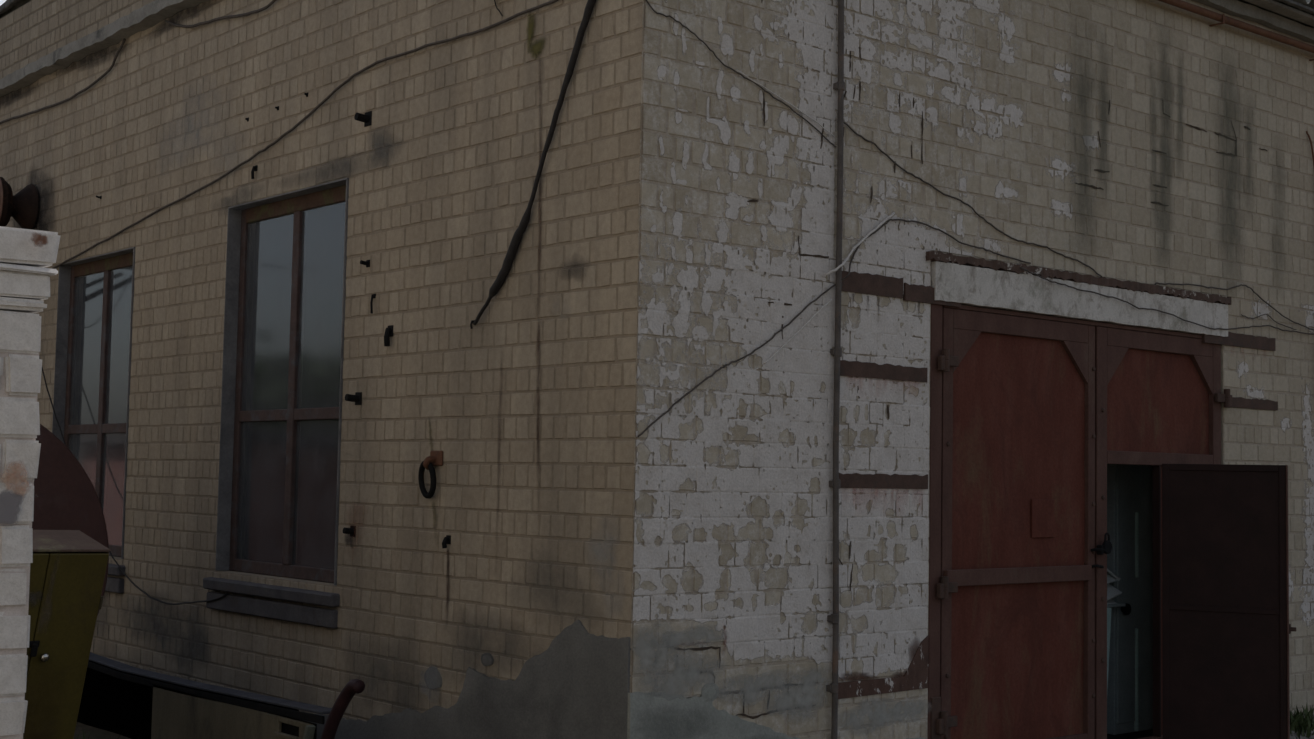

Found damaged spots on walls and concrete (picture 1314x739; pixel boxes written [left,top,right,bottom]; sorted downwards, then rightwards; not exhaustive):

peeling [633,0,1025,682]
peeling [1237,361,1264,399]
peeling [1280,386,1314,626]
flaking render [299,620,800,739]